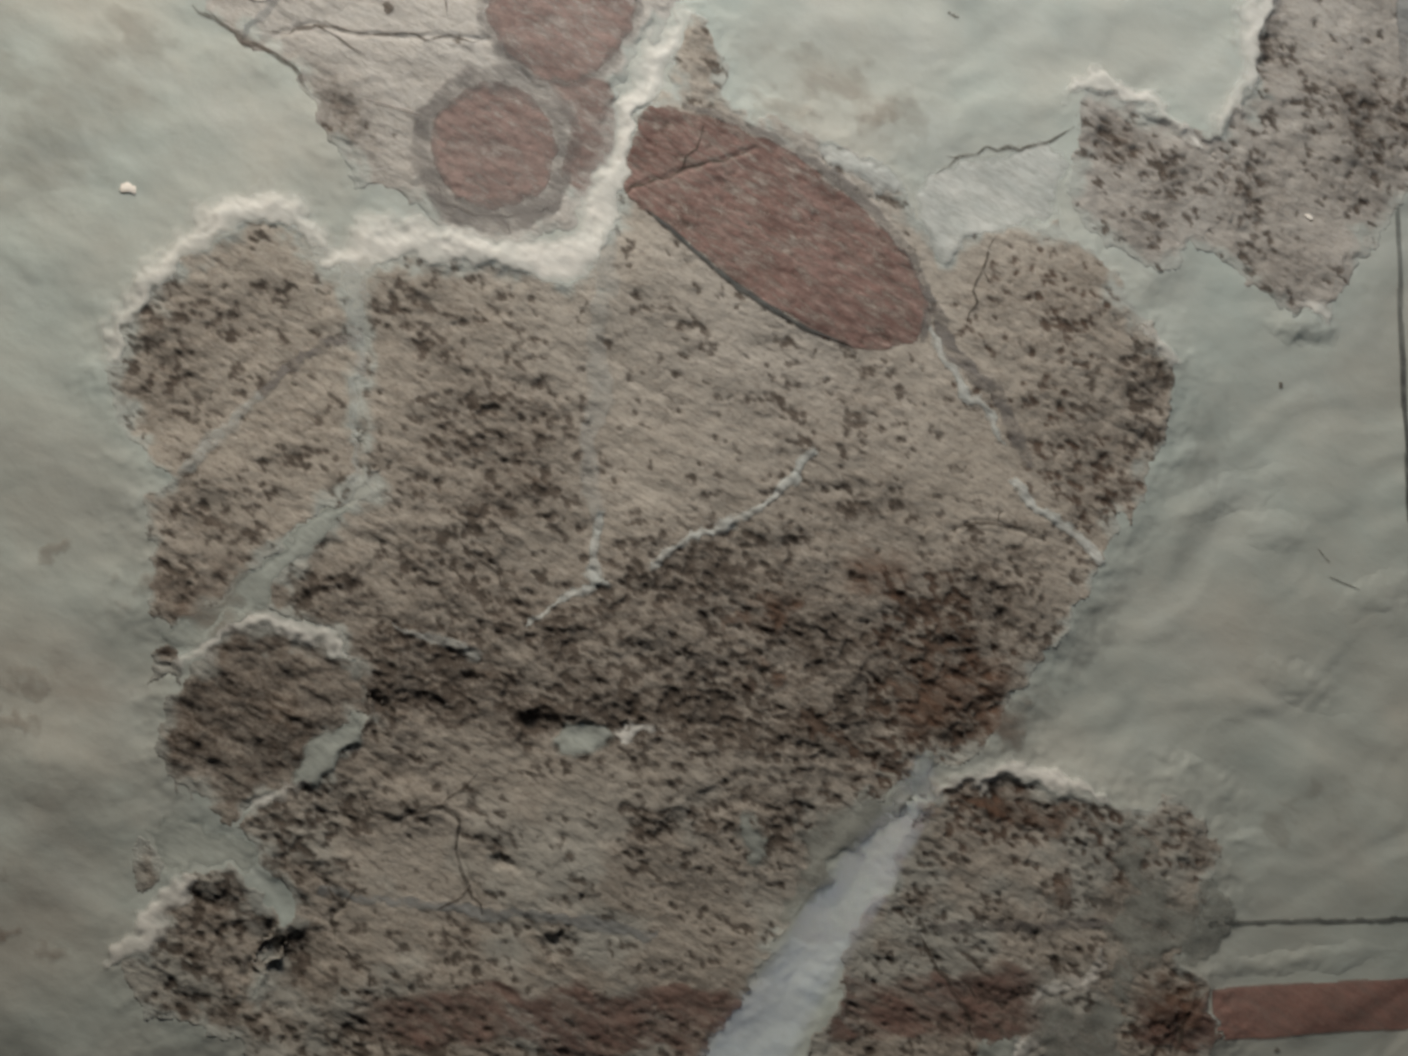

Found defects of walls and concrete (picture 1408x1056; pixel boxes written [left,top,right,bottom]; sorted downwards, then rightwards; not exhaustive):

crack [192,5,483,74]
crack [938,127,1074,173]
spalling [1080,113,1264,223]
spalling [1256,37,1408,194]
spalling [122,285,265,442]
spalling [370,259,547,376]
spalling [945,248,1174,583]
spalling [290,372,1061,889]
spalling [142,873,316,1056]
spalling [255,774,381,924]
spalling [325,915,567,1056]
spalling [841,783,1206,1055]